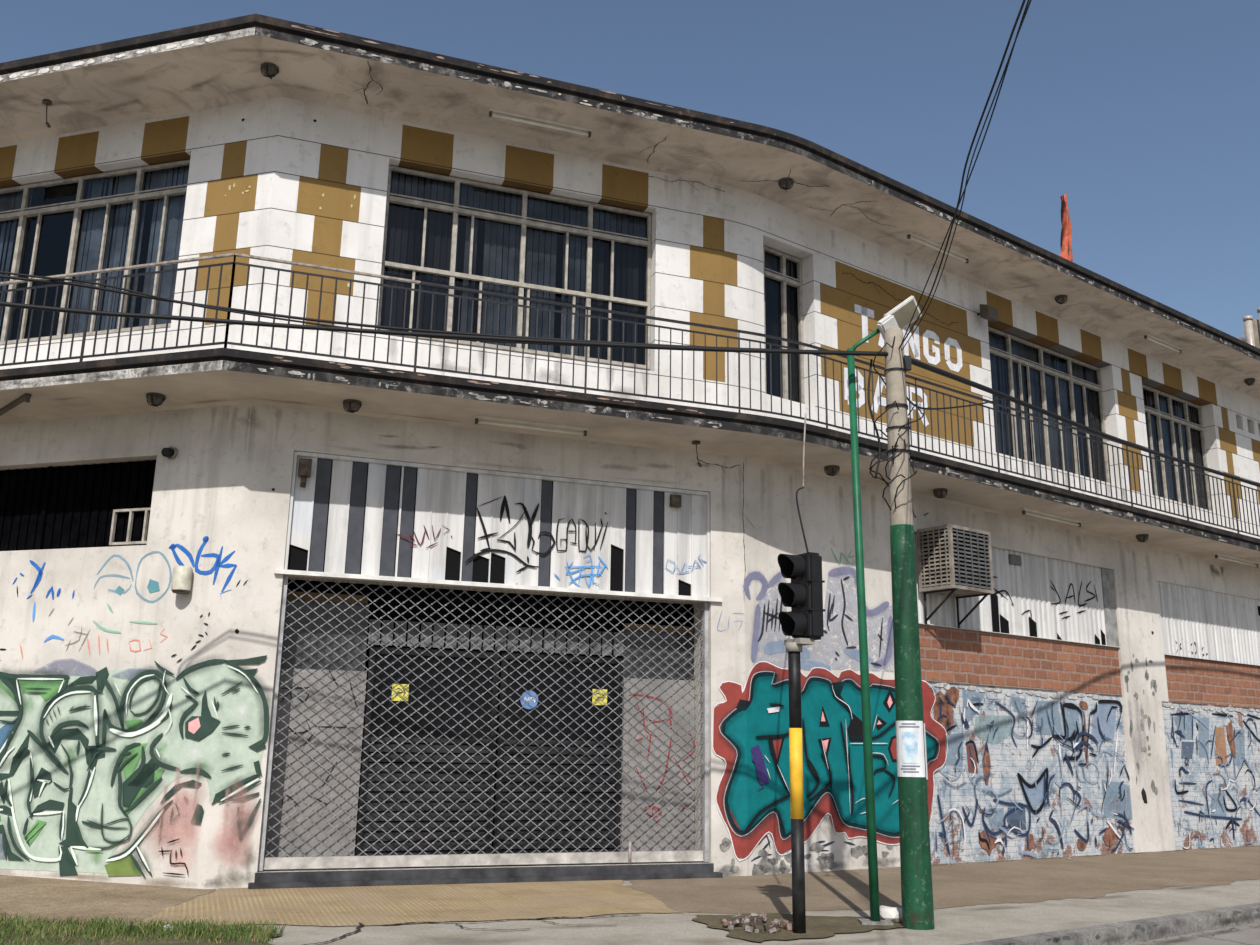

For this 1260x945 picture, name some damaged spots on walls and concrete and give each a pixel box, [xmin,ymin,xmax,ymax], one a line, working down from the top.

peeling [291,25,392,60]
crack [355,61,383,104]
peeling [459,64,561,95]
peeling [580,90,710,129]
peeling [258,357,315,380]
peeling [329,362,425,388]
peeling [459,380,566,407]
peeling [585,398,722,428]